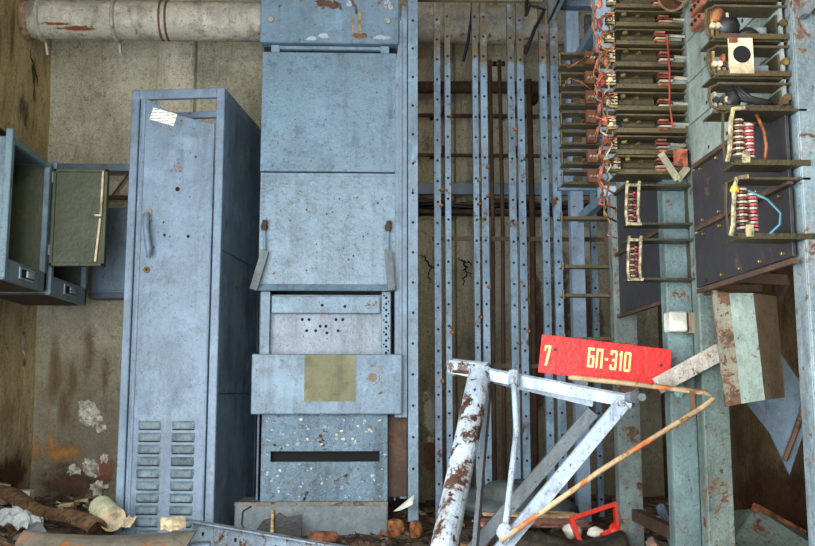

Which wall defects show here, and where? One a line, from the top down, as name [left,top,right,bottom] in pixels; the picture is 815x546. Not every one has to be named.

crack [458,257,472,286]
damp [0,455,25,488]
damp [43,462,111,498]